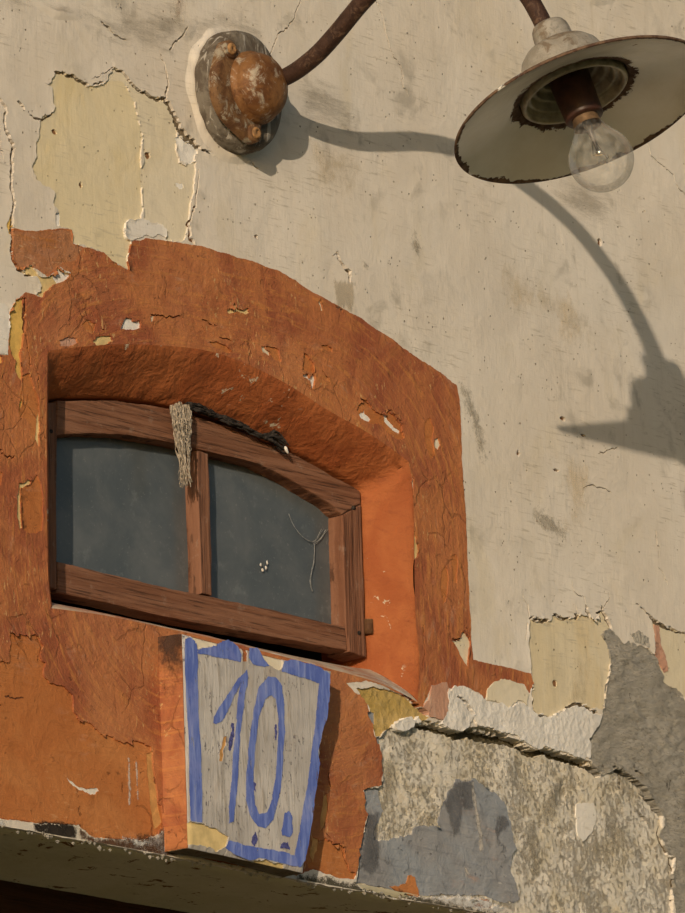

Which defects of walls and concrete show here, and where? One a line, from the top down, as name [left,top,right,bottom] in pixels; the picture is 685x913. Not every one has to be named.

crack [54,67,210,154]
peeling [7,68,197,297]
peeling [0,298,25,380]
peeling [17,475,43,534]
flaking render [306,610,672,913]
crack [415,708,588,772]
crack [656,828,672,901]